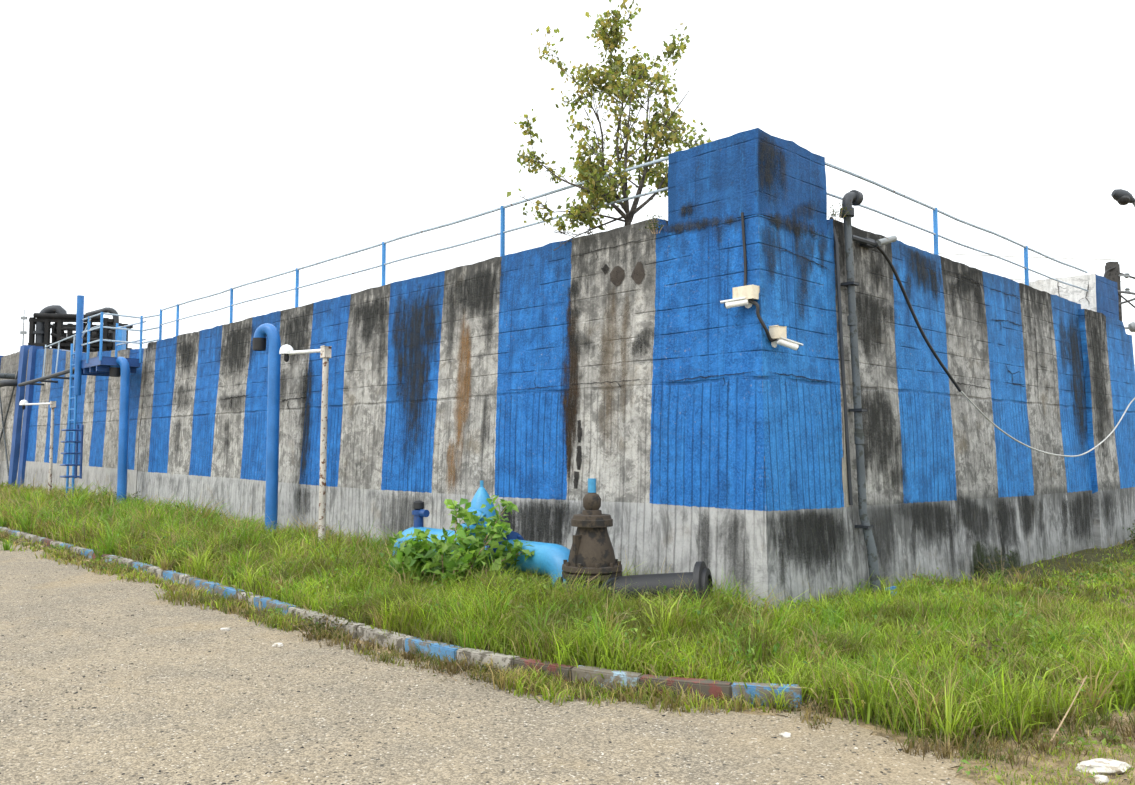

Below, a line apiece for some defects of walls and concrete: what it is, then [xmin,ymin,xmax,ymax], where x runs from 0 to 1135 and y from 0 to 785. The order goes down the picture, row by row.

damp [354,269,501,453]
corrosion [447,321,471,485]
damp [561,282,650,478]
damp [847,294,893,352]
damp [860,377,903,485]
crack [944,270,1047,395]
damp [1059,320,1111,455]
damp [387,498,414,535]
damp [773,511,850,573]
damp [874,494,1044,579]
damp [1063,492,1113,538]